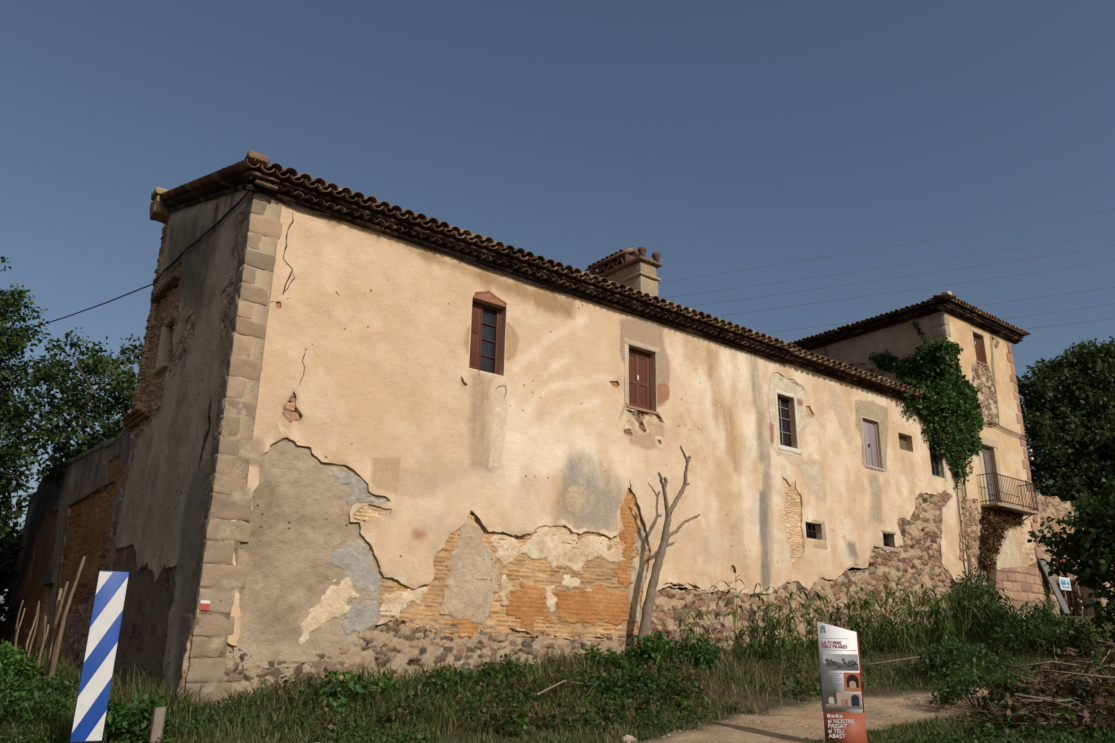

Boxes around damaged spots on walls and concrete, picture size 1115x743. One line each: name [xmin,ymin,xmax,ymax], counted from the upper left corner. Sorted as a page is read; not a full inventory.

crack [270,212,295,303]
flaking render [131,259,197,441]
flaking render [620,319,669,448]
flaking render [18,511,116,672]
flaking render [224,393,1051,706]